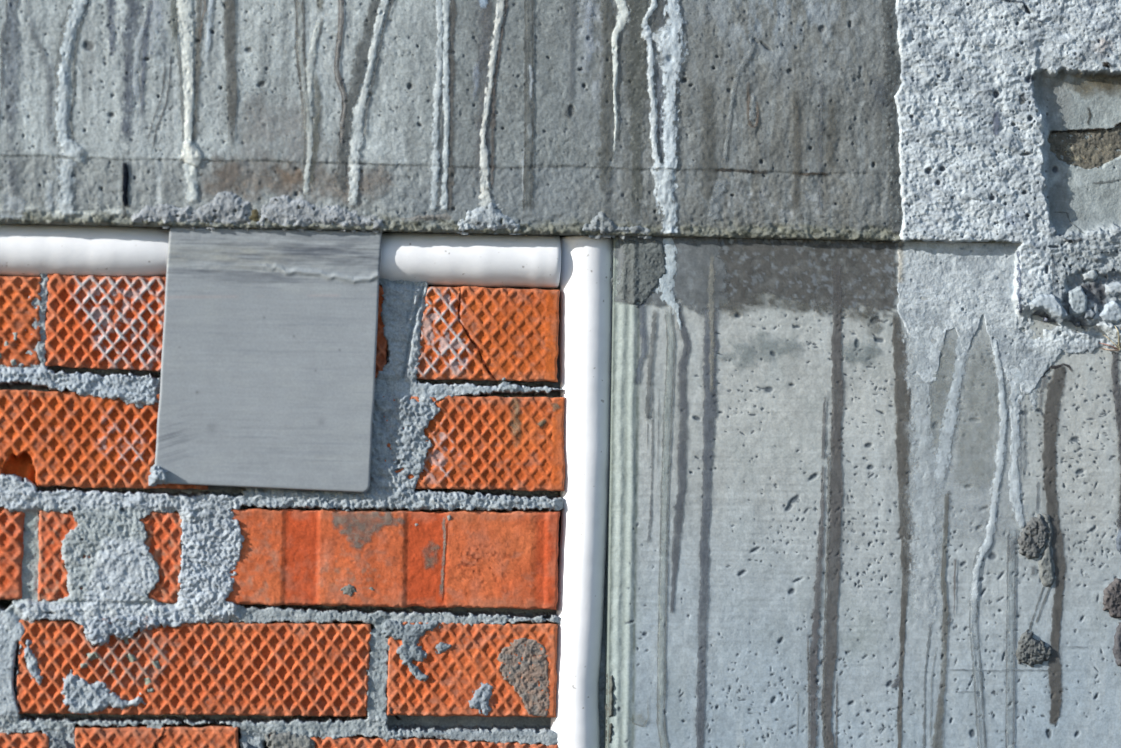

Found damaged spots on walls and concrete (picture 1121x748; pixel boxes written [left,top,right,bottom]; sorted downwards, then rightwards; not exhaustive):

leakage [0,0,21,122]
leakage [0,196,25,218]
leakage [45,0,88,215]
leakage [106,0,394,205]
efflorescence [429,0,456,210]
leakage [474,0,508,206]
leakage [521,0,534,208]
spalling [1047,125,1121,169]
crack [458,290,494,378]
leakage [586,0,1066,748]
leakage [1111,352,1121,465]